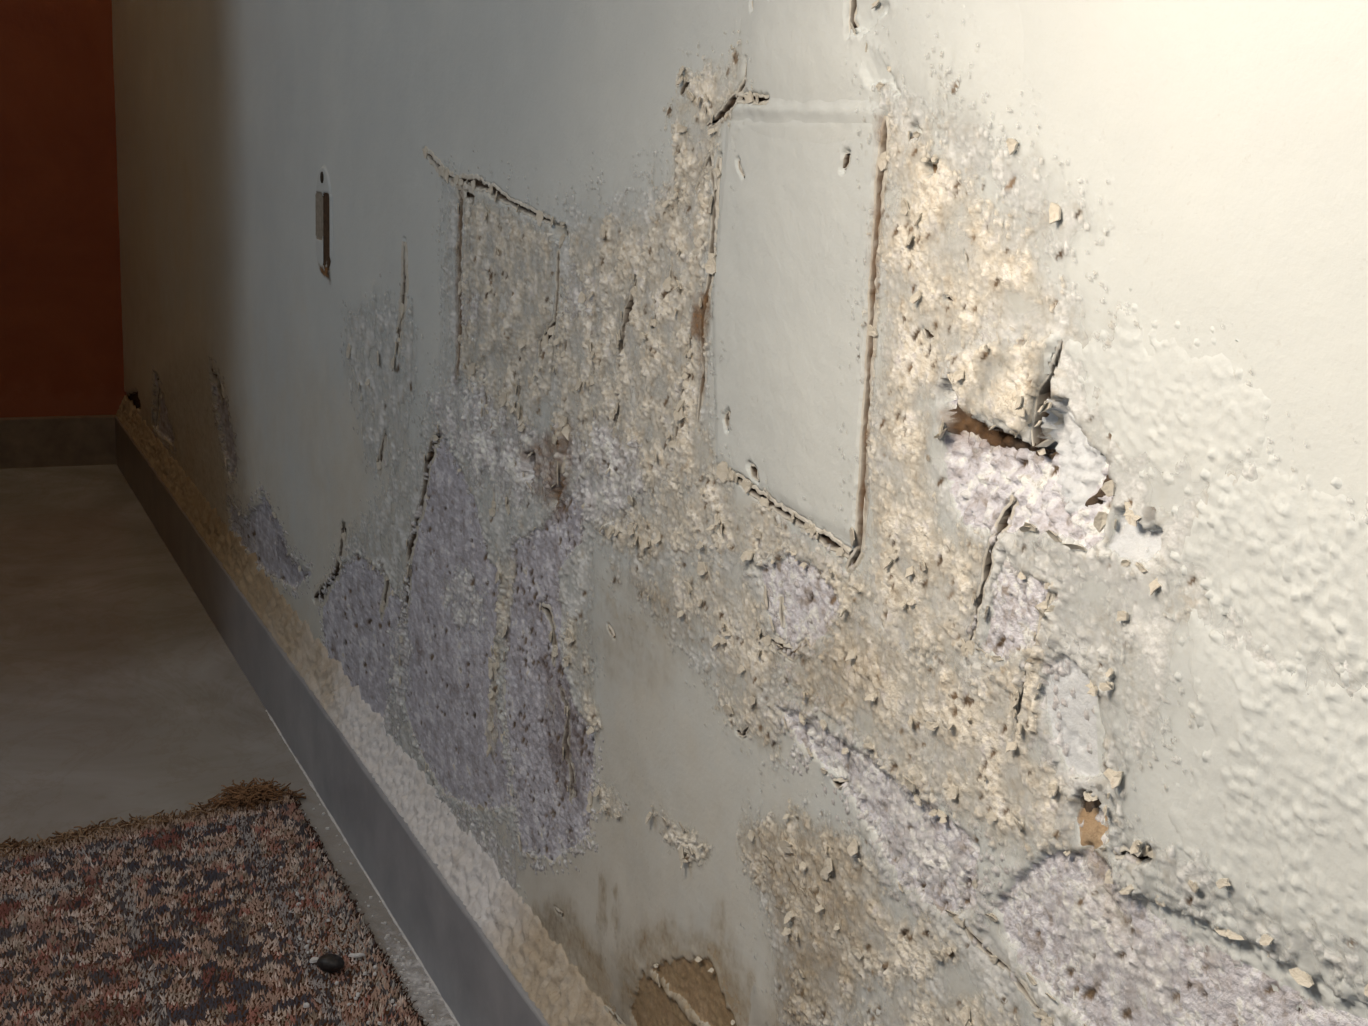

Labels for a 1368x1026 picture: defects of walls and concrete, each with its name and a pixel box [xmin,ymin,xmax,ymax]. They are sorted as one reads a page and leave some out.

crack [422,63,769,448]
crack [716,116,892,574]
crack [1031,341,1064,447]
crack [960,495,1019,662]
peeling [736,726,751,738]
peeling [739,373,1368,1026]
peeling [631,956,737,1026]